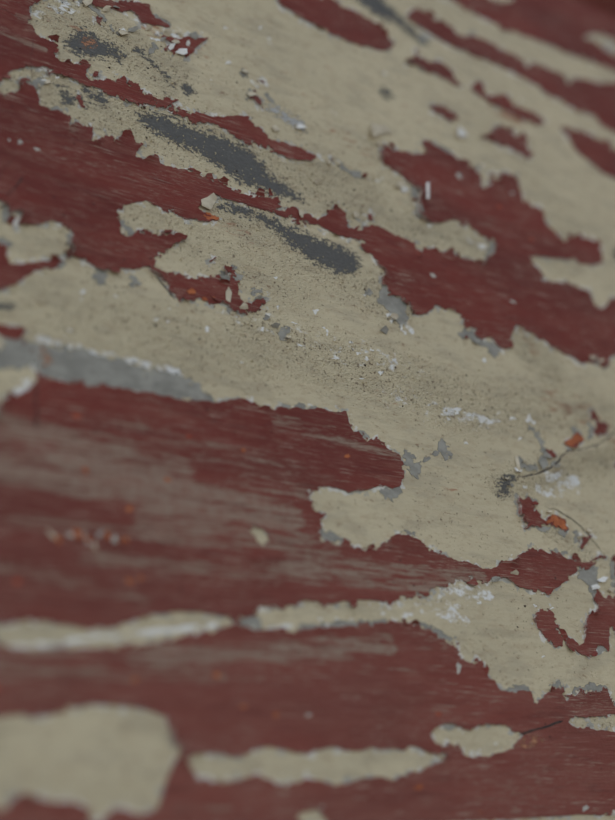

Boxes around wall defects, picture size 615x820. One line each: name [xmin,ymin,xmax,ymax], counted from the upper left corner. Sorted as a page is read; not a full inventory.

peeling [0,0,615,576]
peeling [0,555,615,820]